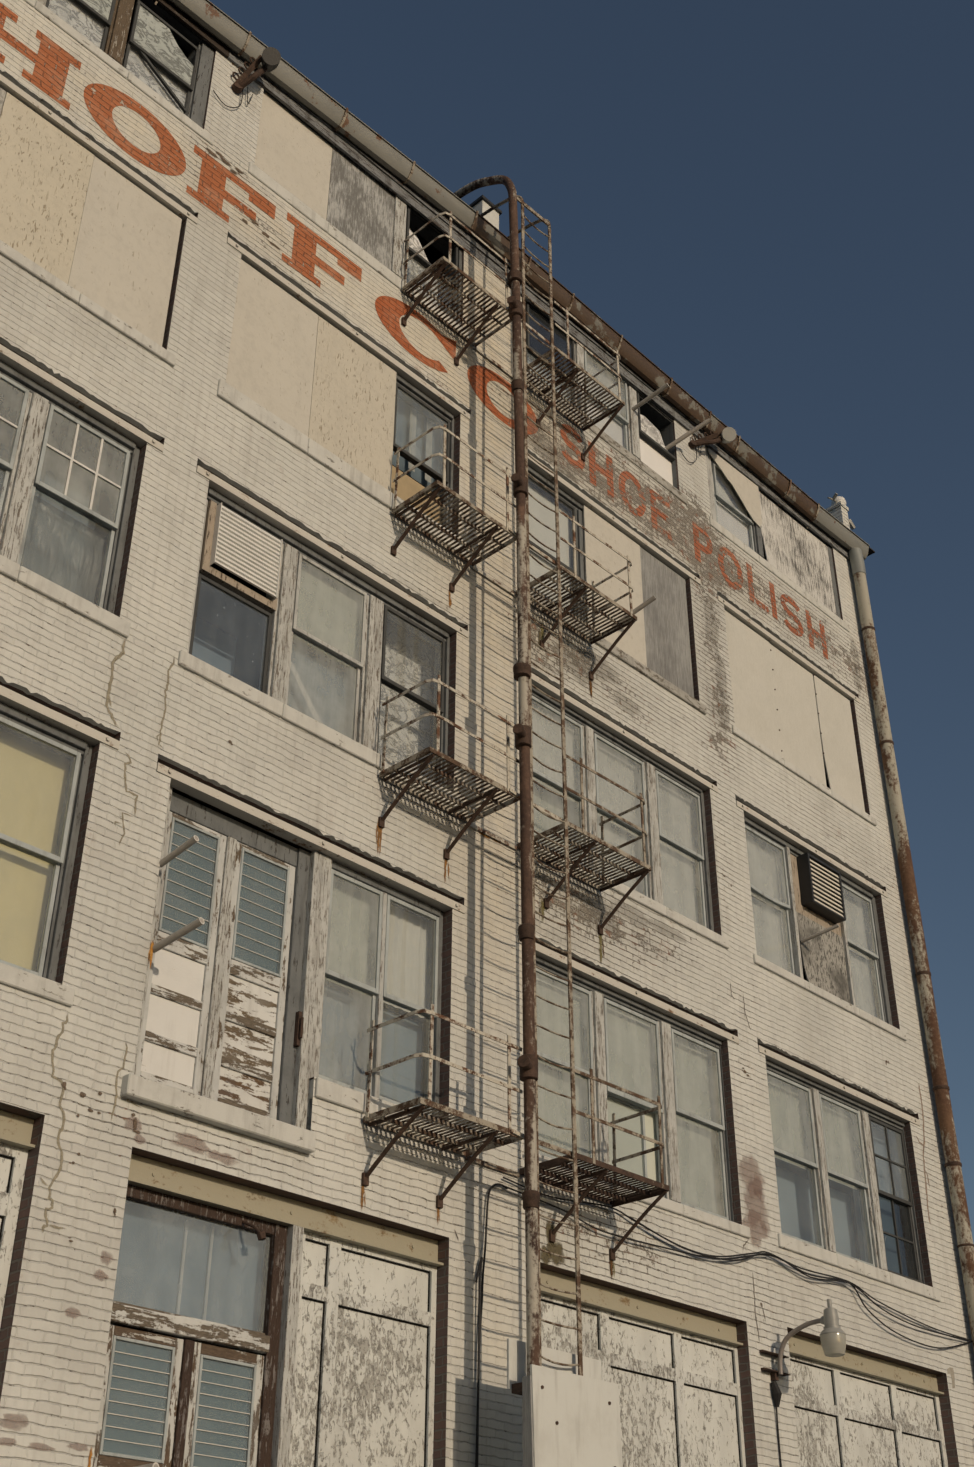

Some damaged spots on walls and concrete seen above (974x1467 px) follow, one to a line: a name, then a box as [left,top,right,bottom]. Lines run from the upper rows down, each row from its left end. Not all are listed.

crack [105,641,175,843]
crack [41,1016,68,1231]